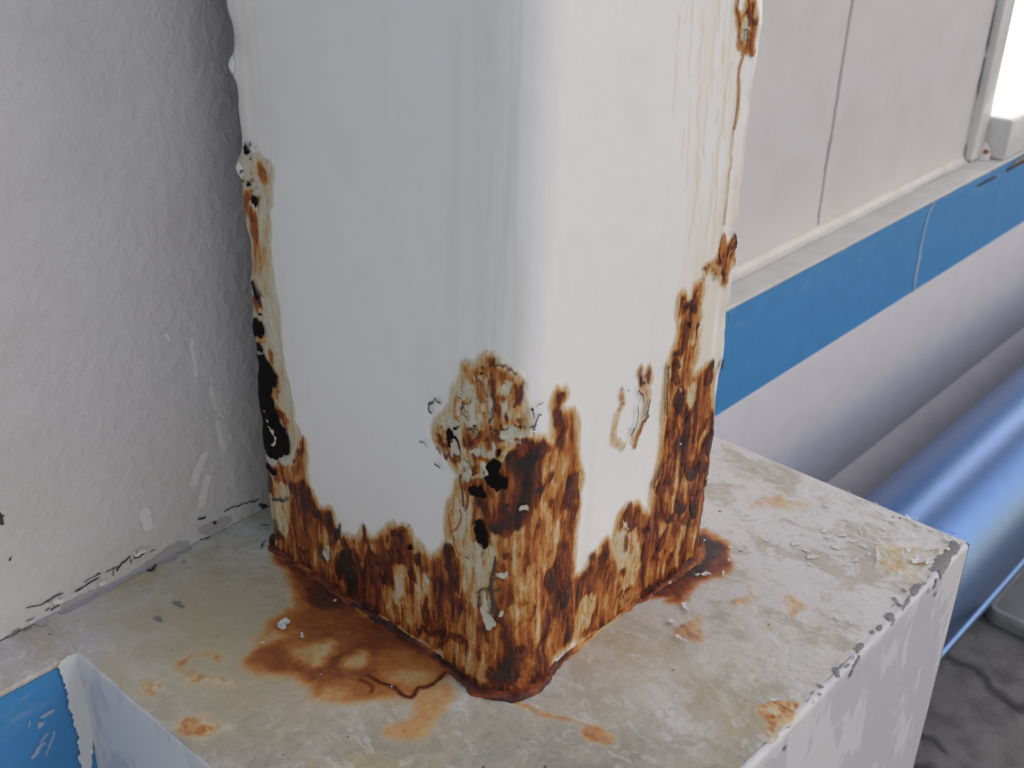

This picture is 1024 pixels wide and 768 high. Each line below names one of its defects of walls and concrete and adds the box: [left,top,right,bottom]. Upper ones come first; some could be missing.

corrosion [724,0,760,225]
crack [818,0,854,225]
corrosion [228,142,775,755]
peeling [6,540,192,637]
peeling [791,514,960,678]